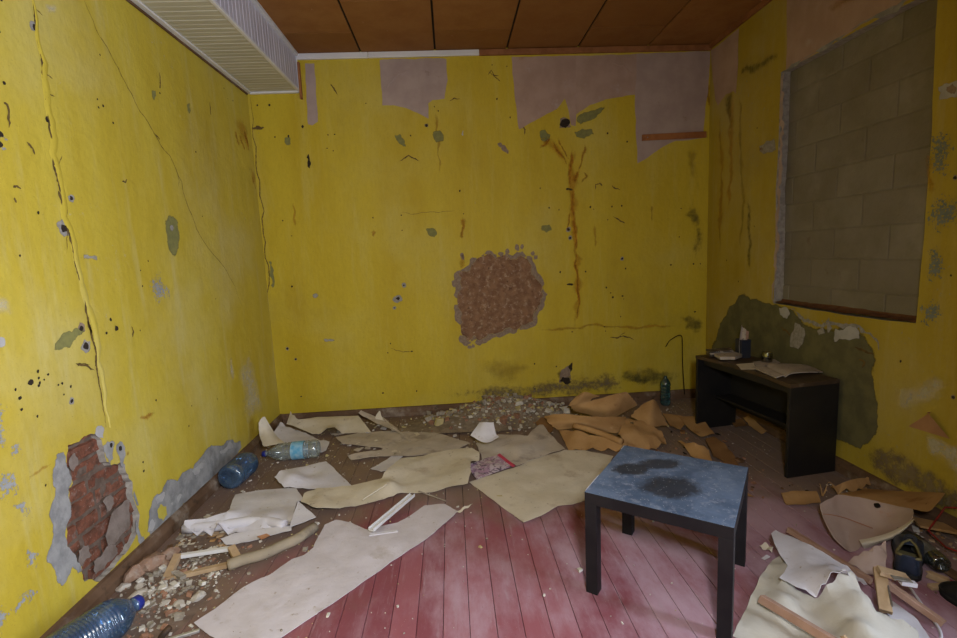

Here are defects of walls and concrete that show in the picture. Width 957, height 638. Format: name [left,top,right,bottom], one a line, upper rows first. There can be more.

crack [33,5,62,204]
crack [66,226,80,280]
crack [76,302,106,423]
crack [250,99,270,293]
flaking render [452,244,547,349]
peeling [560,108,604,138]
flaking render [712,72,879,449]
flaking render [26,426,241,586]